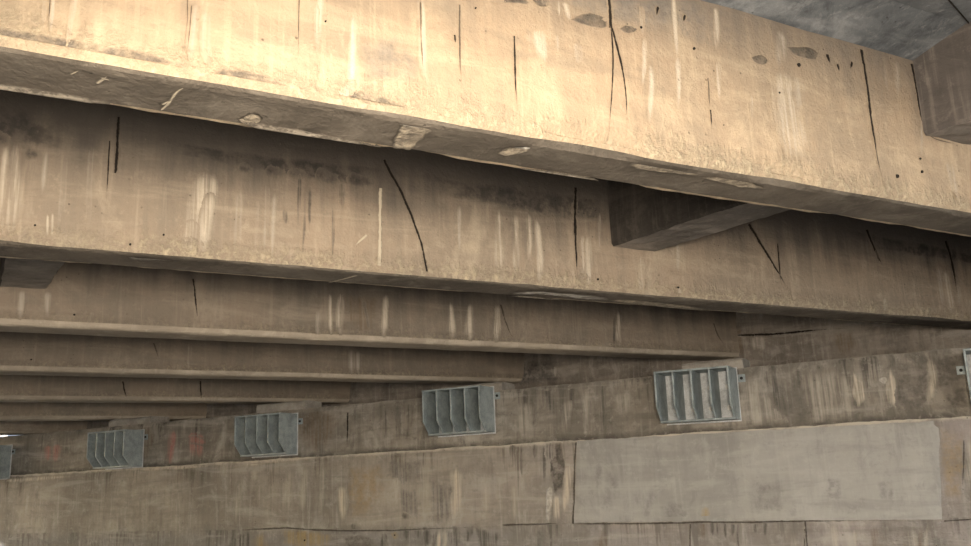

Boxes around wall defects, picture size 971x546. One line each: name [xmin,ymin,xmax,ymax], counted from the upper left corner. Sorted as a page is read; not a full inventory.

crack [294,0,302,54]
crack [453,4,462,77]
crack [511,36,519,109]
peeling [571,13,607,29]
crack [606,0,628,142]
crack [106,117,122,201]
crack [858,49,885,187]
crack [328,159,430,283]
crack [571,187,579,280]
crack [747,223,791,295]